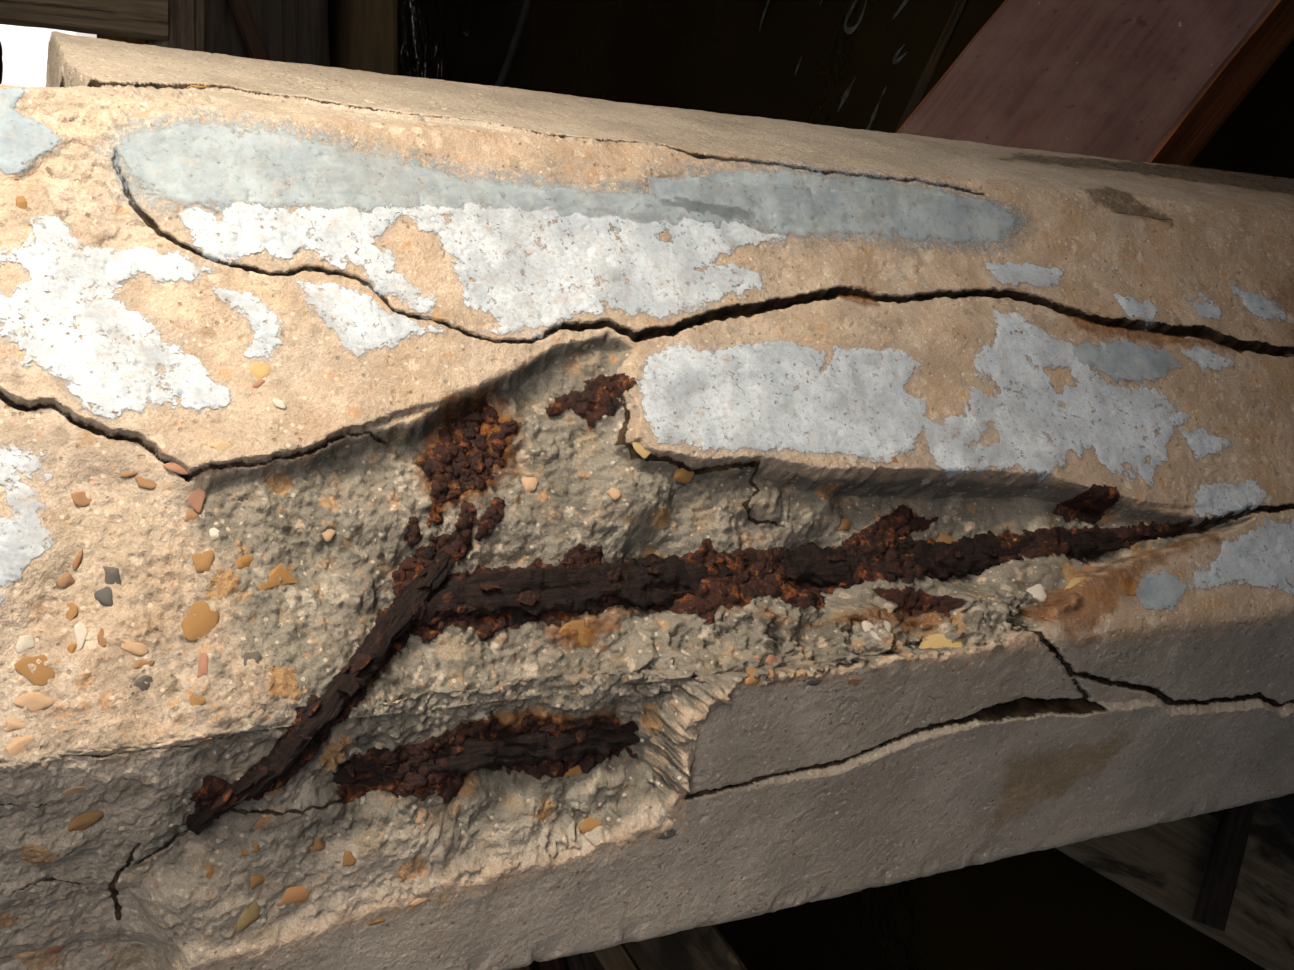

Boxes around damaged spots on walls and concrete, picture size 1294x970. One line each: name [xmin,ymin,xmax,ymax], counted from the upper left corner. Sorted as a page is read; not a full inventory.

crack [60,77,469,120]
crack [502,125,984,196]
peeling [0,31,1027,422]
crack [112,148,1294,357]
peeling [985,261,1064,288]
peeling [1114,293,1159,332]
peeling [1230,286,1287,322]
crack [0,392,388,482]
rust [546,373,637,427]
spalling [0,309,1294,970]
rust [186,389,1218,835]
crack [685,610,1294,799]